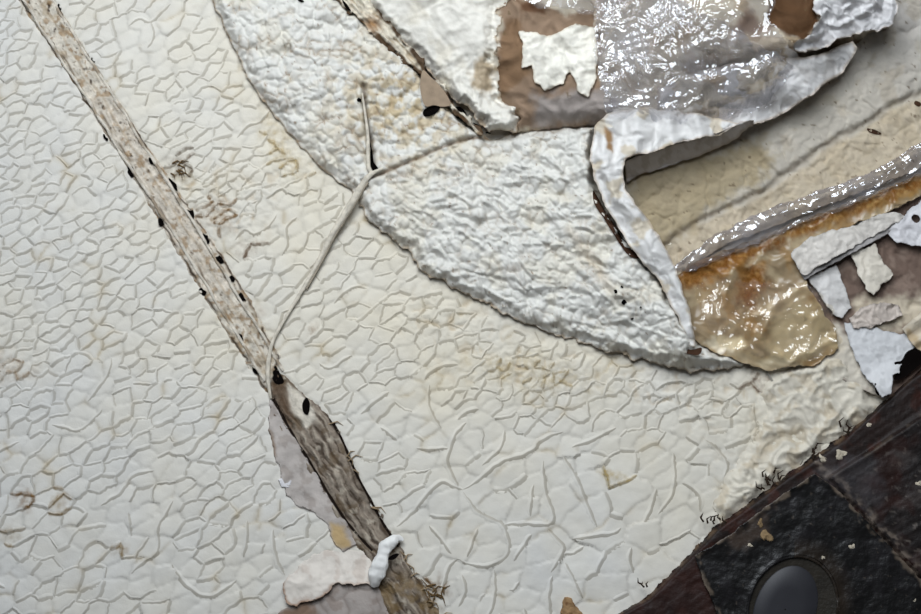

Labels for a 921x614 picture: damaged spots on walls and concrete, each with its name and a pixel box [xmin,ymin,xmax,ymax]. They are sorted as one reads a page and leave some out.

crack [0,0,330,614]
peeling [268,399,389,614]
crack [69,0,761,614]
peeling [791,196,921,400]